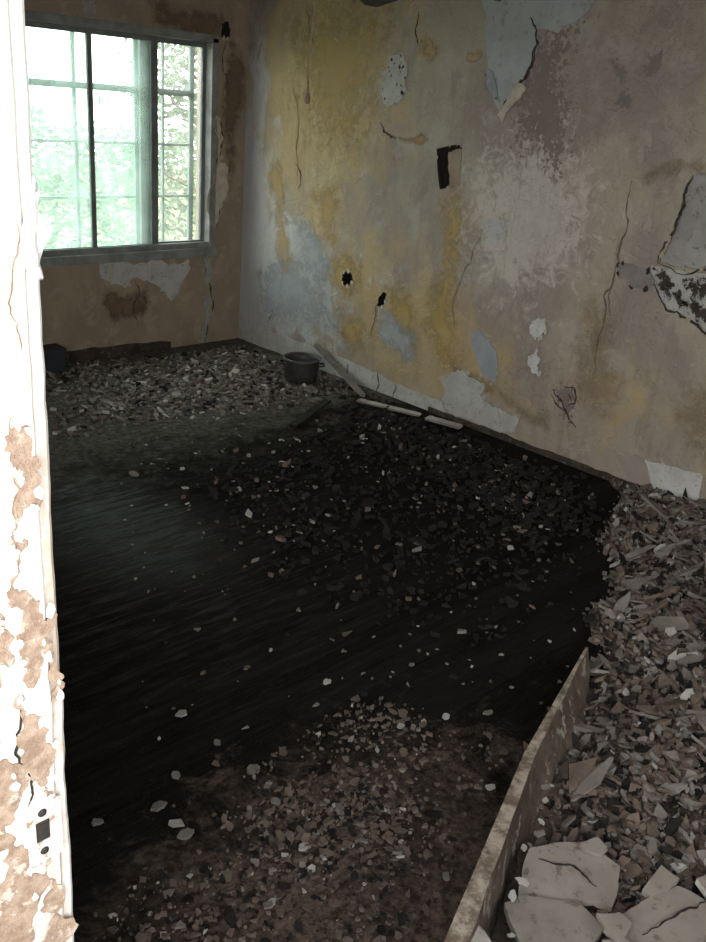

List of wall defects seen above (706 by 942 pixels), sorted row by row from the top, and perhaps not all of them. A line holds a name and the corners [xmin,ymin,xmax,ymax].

leakage [223,42,244,172]
peeling [379,52,408,107]
peeling [481,0,595,183]
crack [7,218,22,350]
leakage [103,292,147,319]
flaking render [99,258,191,301]
flaking render [241,327,519,433]
flaking render [527,318,547,376]
crack [551,181,632,428]
flaking render [616,170,706,332]
flaking render [615,454,703,500]
peeling [0,425,79,942]